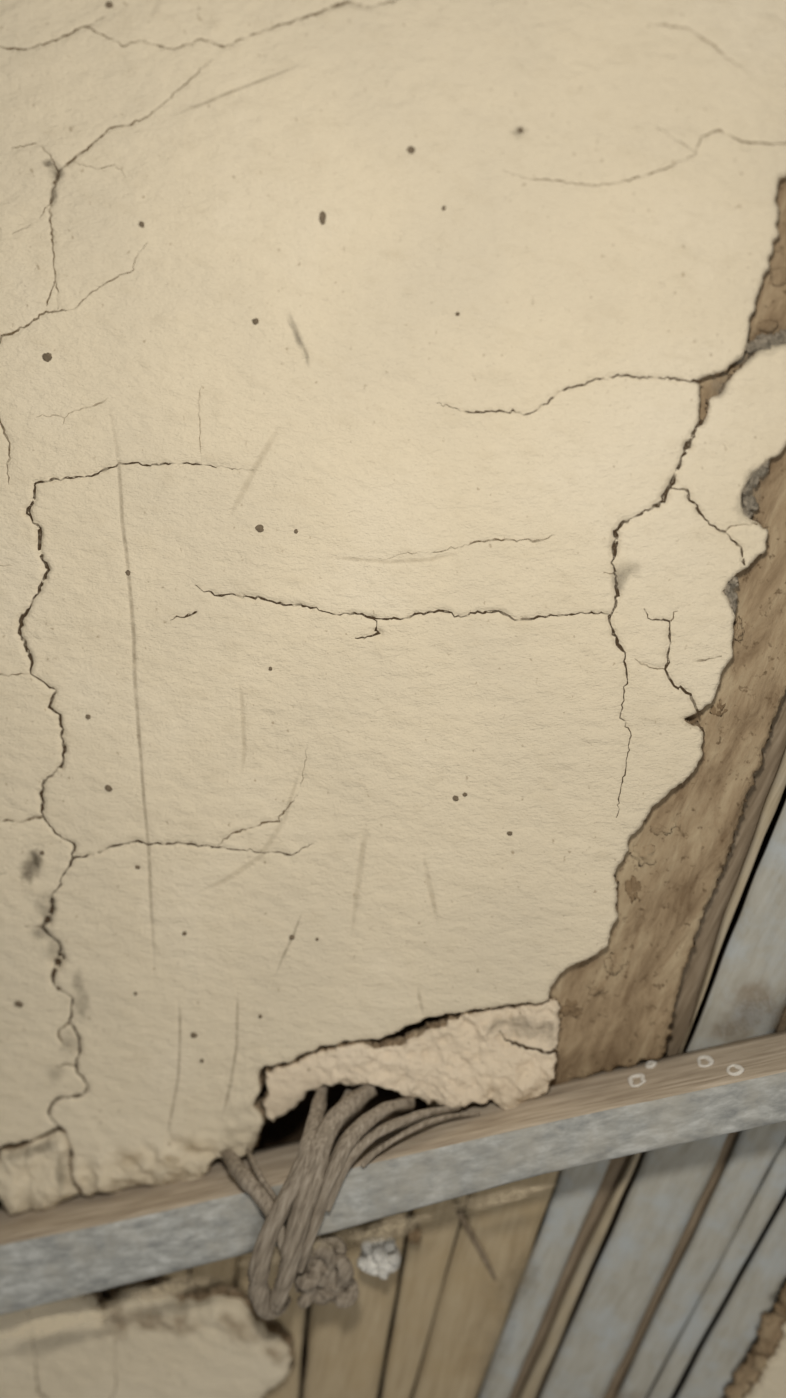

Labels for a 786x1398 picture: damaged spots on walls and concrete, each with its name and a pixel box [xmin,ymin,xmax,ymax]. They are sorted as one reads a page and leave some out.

crack [0,0,396,343]
crack [503,127,786,186]
crack [439,374,702,415]
spalling [699,178,786,420]
crack [172,419,758,817]
crack [0,419,314,1130]
spalling [261,446,786,1122]
crack [499,1031,558,1055]
spalling [723,1283,786,1398]